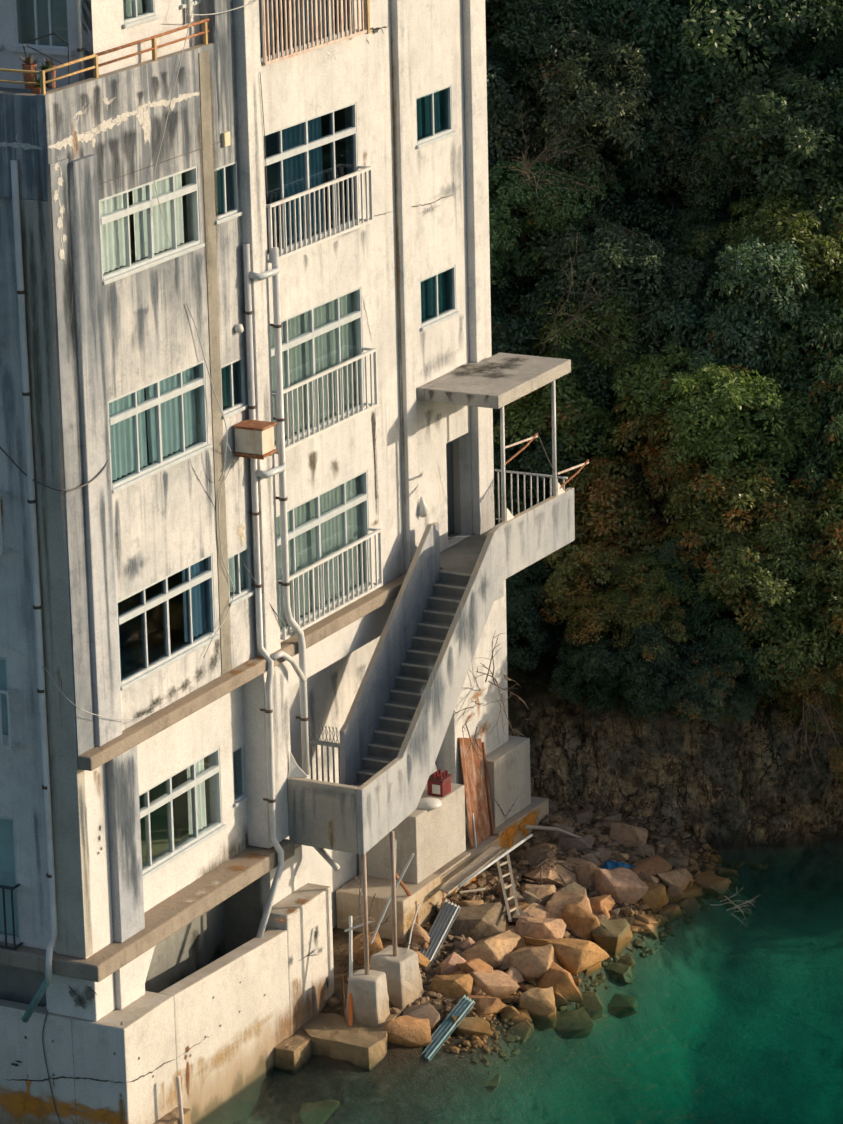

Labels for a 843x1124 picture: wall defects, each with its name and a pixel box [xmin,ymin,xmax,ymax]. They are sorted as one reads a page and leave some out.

damp [81,80,117,116]
damp [139,68,183,102]
damp [152,0,231,199]
damp [138,272,158,341]
damp [196,256,207,302]
damp [9,132,135,551]
damp [101,499,119,645]
damp [128,558,143,575]
damp [113,758,139,890]
corrosion [459,738,538,849]
crack [6,1034,213,1083]
corrosion [0,1074,126,1124]